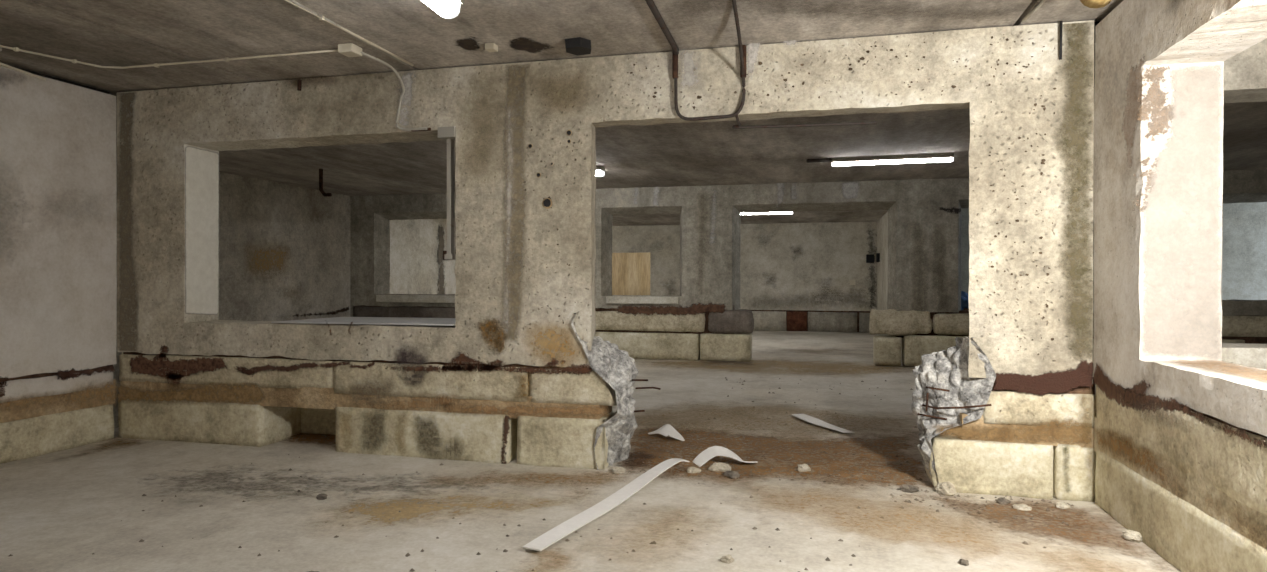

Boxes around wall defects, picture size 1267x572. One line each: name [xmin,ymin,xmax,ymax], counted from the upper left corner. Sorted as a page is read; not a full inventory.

spalling [988,185,1051,322]
leakage [352,349,461,458]
spalling [558,293,661,470]
spalling [911,337,1093,484]
rust [1097,431,1182,497]